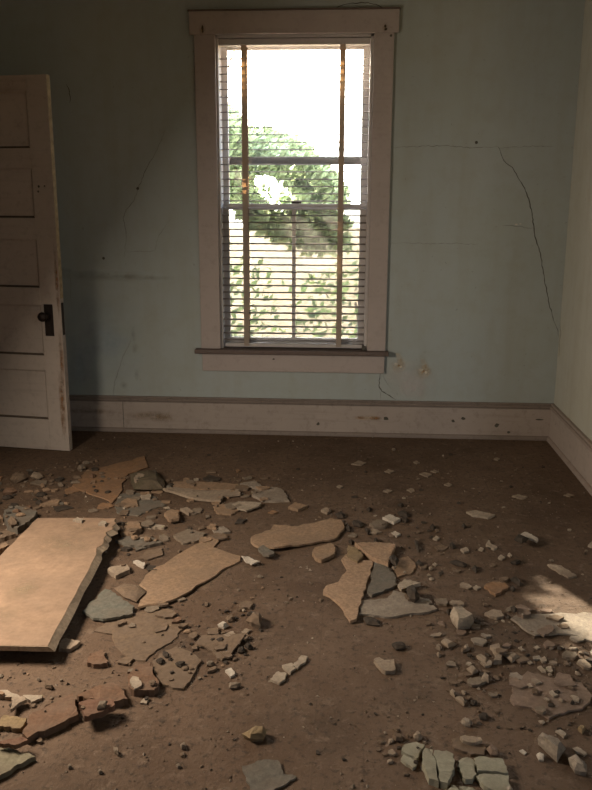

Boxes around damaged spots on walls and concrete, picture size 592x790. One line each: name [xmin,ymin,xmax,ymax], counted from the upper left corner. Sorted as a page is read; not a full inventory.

crack [394,145,558,330]